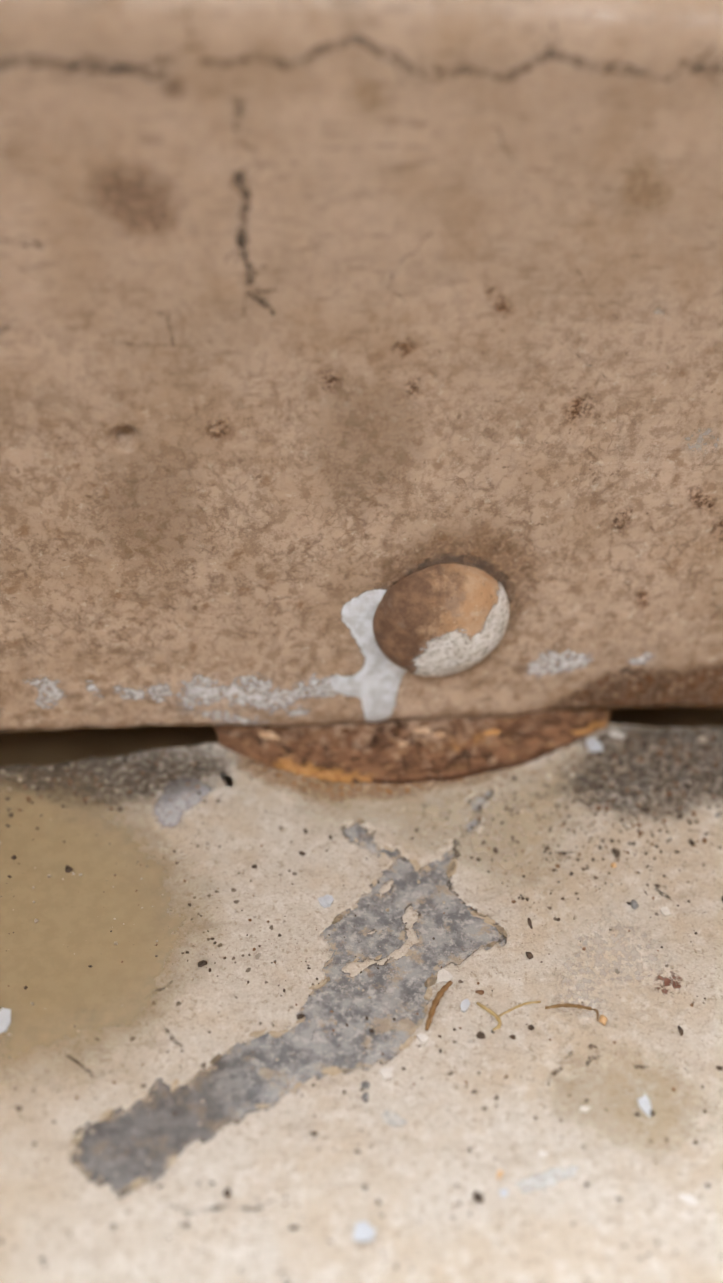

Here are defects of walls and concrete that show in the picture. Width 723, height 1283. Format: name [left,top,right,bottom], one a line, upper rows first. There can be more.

crack [0,34,722,82]
crack [233,170,275,315]
peeling [69,789,508,1199]